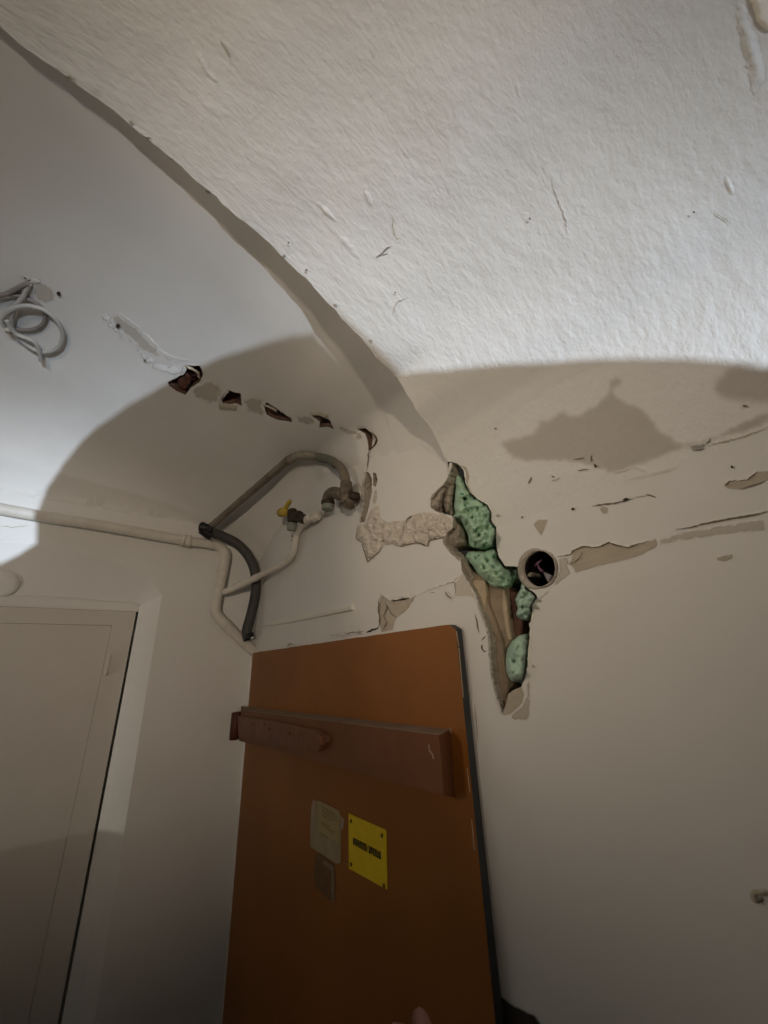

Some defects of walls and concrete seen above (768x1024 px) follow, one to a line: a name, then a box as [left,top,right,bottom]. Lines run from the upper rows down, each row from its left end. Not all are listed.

flaking render [168,365,203,394]
flaking render [218,390,242,411]
flaking render [263,402,292,421]
flaking render [310,412,333,428]
flaking render [359,428,378,451]
flaking render [724,465,768,489]
peeling [521,516,547,535]
flaking render [556,522,763,584]
flaking render [355,463,537,716]